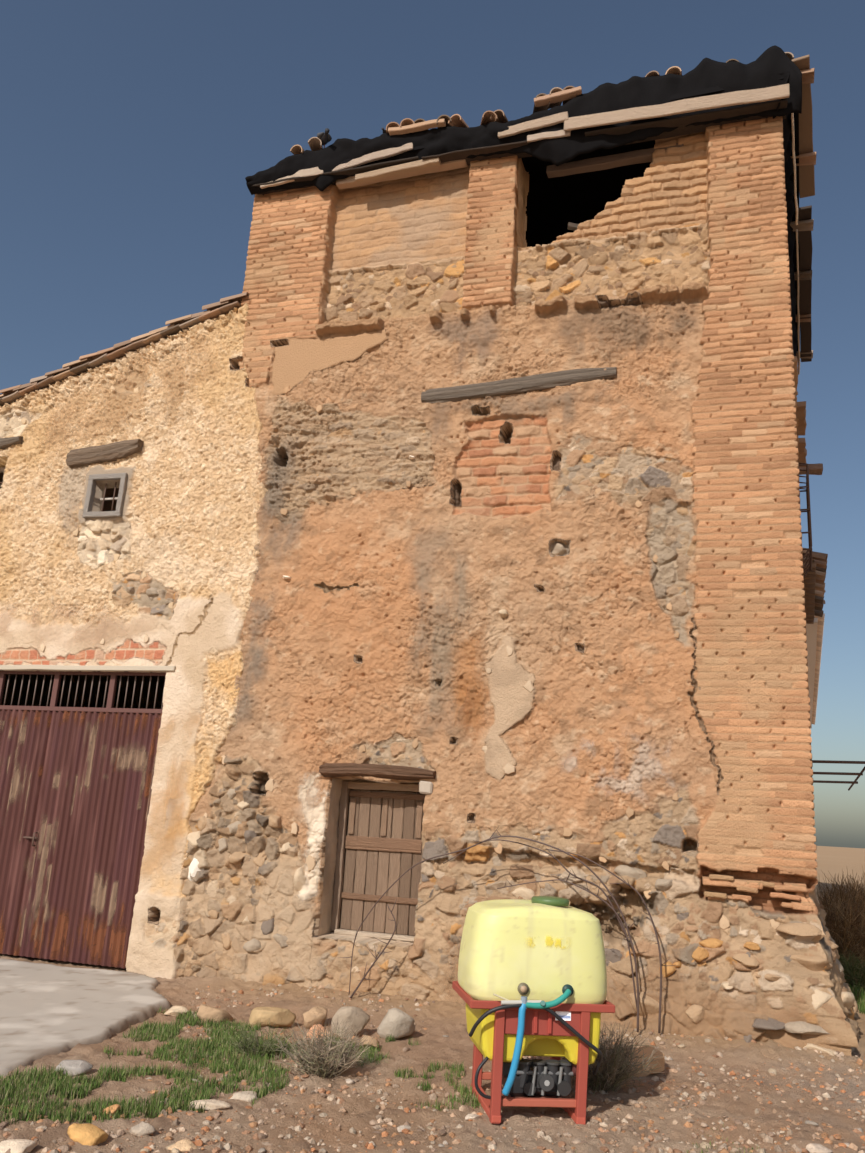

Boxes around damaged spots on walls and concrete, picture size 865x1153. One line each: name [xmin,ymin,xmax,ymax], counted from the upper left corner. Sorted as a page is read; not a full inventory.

peeling [0,634,167,666]
rust [10,710,162,760]
peeling [482,633,536,781]
crack [688,617,724,795]
rust [0,904,127,966]
flaking render [174,755,320,988]
flaking render [458,783,827,930]